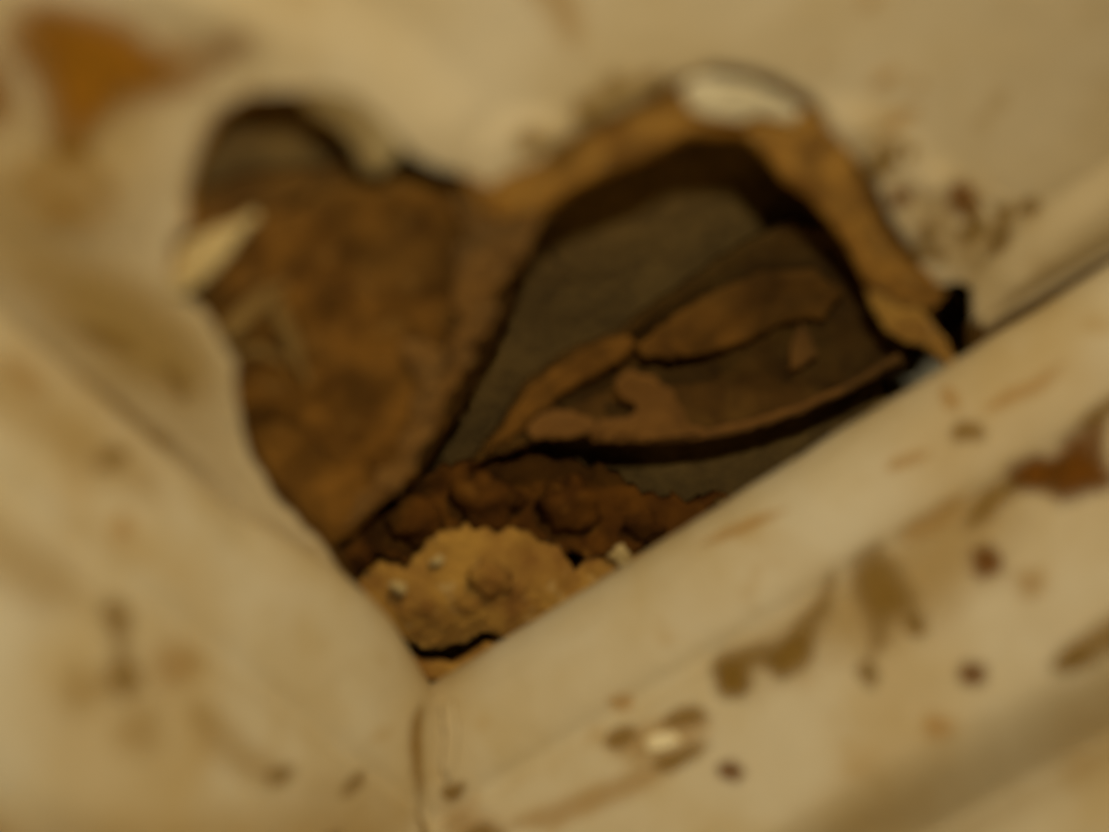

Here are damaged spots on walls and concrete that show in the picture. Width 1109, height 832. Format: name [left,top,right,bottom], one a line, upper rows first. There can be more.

damp [12,8,186,149]
spalling [171,88,403,282]
spalling [462,73,970,331]
spalling [241,418,364,592]
spalling [403,639,427,657]
damp [774,642,809,675]